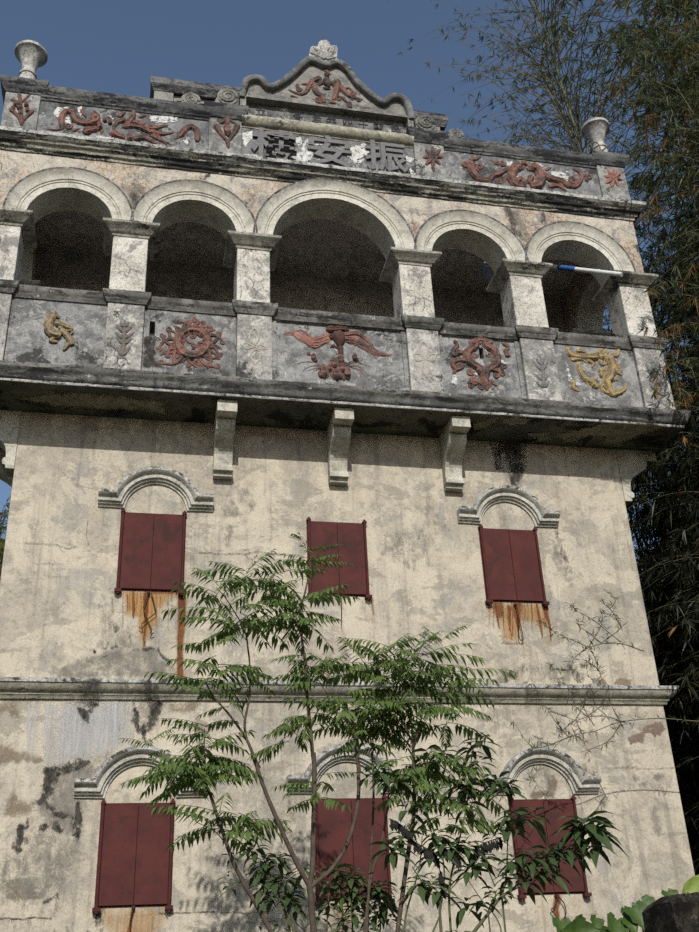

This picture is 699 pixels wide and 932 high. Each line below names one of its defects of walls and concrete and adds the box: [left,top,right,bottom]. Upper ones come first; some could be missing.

damp [490,442,526,486]
rust [122,591,186,678]
rust [491,602,551,639]
damp [2,615,171,903]